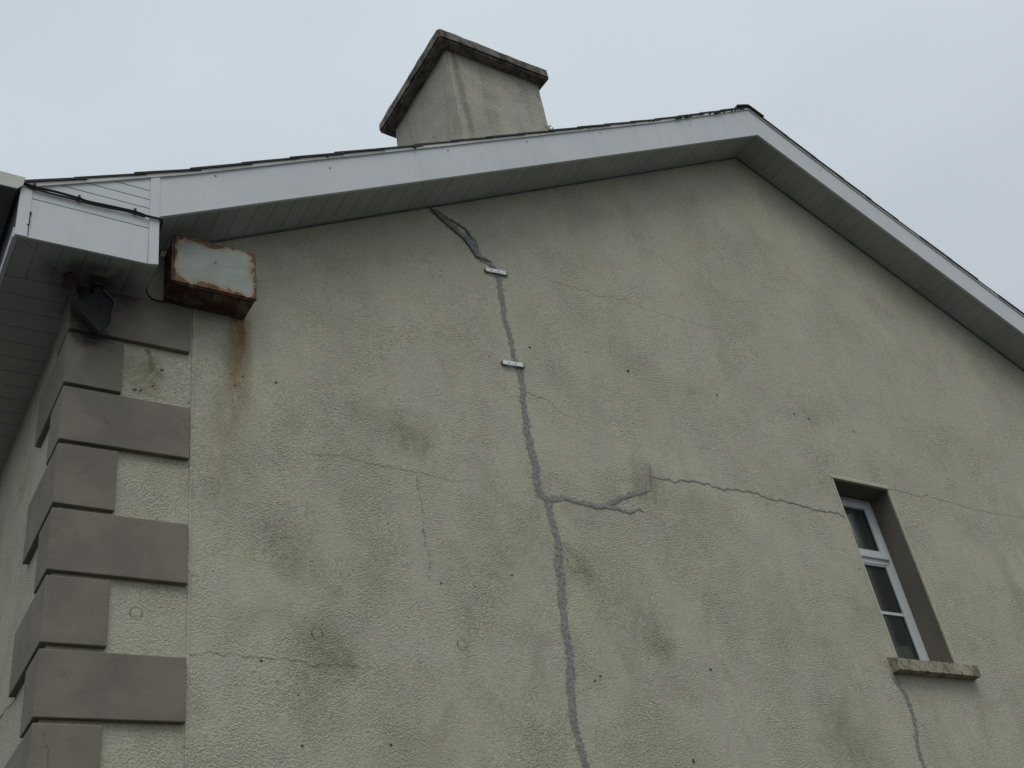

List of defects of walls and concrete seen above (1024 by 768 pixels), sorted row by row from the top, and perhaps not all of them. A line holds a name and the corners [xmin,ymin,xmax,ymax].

crack [430,208,858,768]
crack [891,673,925,768]